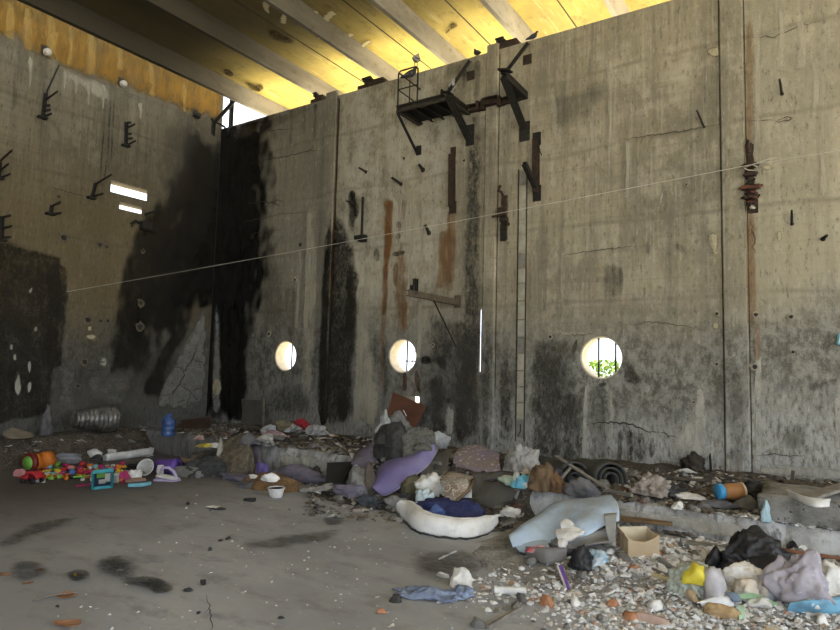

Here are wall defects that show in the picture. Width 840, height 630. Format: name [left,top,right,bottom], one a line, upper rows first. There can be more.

crack [628,124,720,140]
damp [48,264,68,366]
damp [111,134,220,397]
damp [295,191,389,426]
corrosion [382,200,406,315]
damp [417,133,491,443]
damp [206,359,215,417]
damp [234,335,247,420]
damp [533,330,588,460]
crack [590,421,677,438]